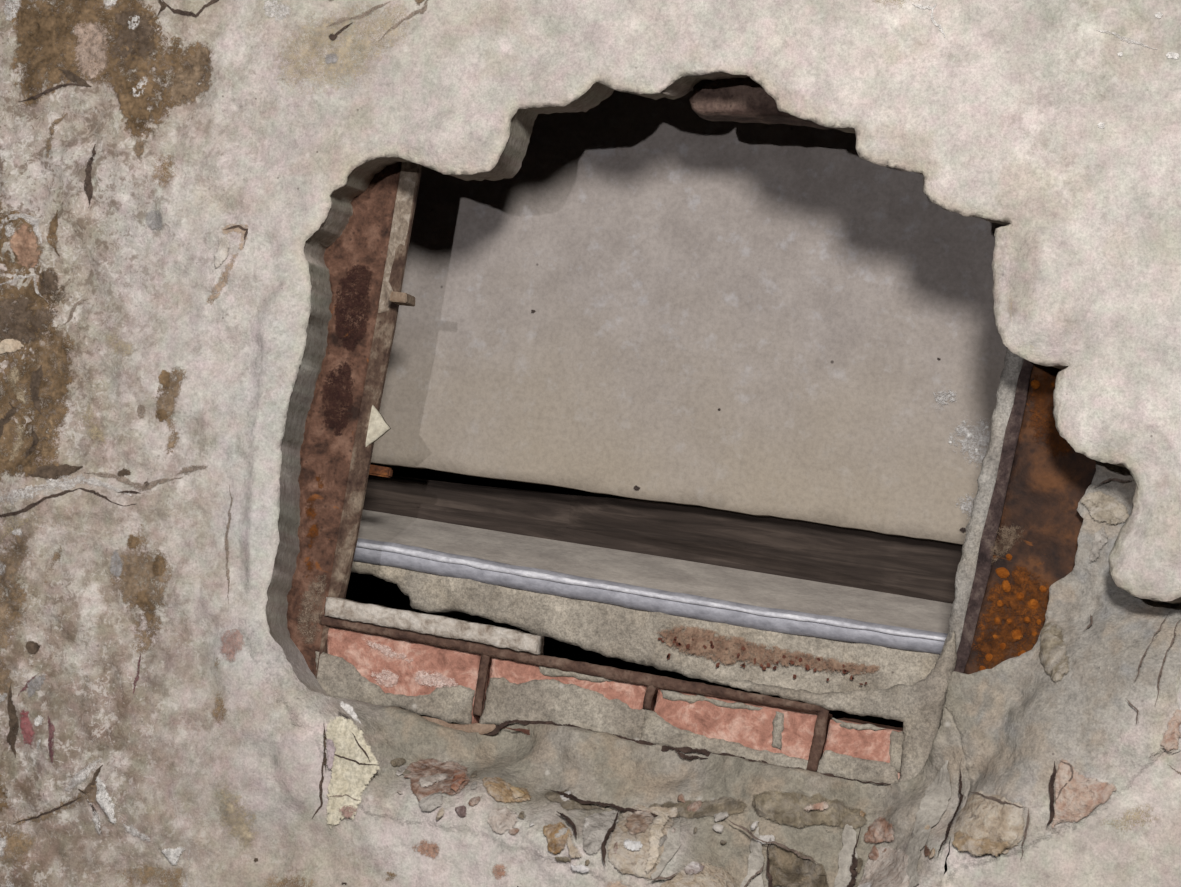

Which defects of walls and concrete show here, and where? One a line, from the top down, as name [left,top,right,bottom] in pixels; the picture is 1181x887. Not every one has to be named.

rust [322,264,372,436]
rust [1027,370,1074,457]
crack [0,464,206,517]
rust [297,473,327,645]
spalling [212,461,1181,887]
rust [655,624,880,685]
rust [971,554,1050,673]
peeling [0,759,150,857]
peeling [162,846,190,887]